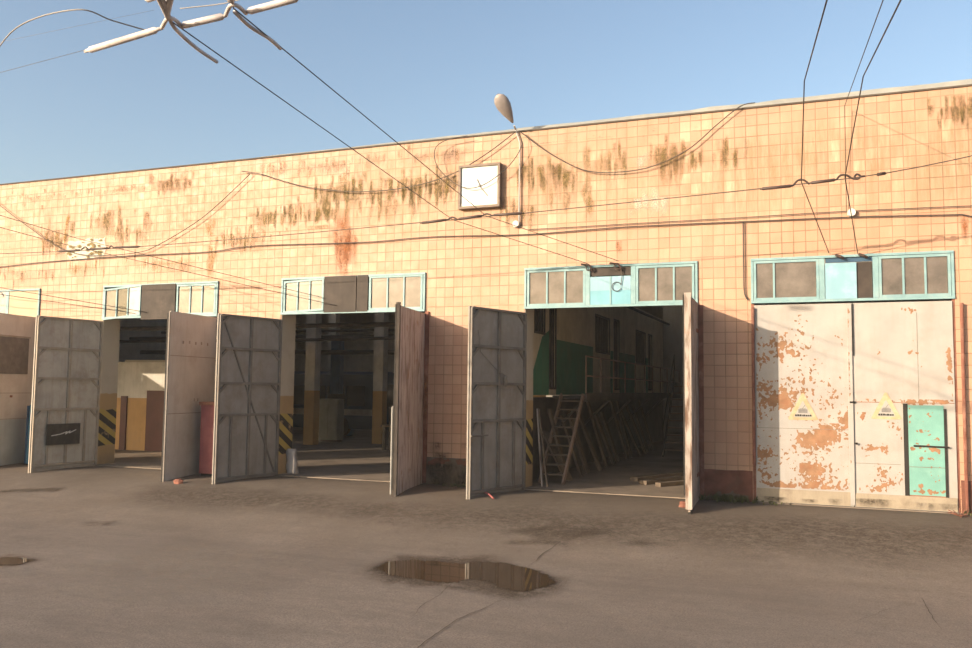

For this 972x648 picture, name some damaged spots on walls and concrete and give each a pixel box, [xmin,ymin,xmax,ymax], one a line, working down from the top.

peeling [756,315,903,493]
peeling [887,345,953,495]